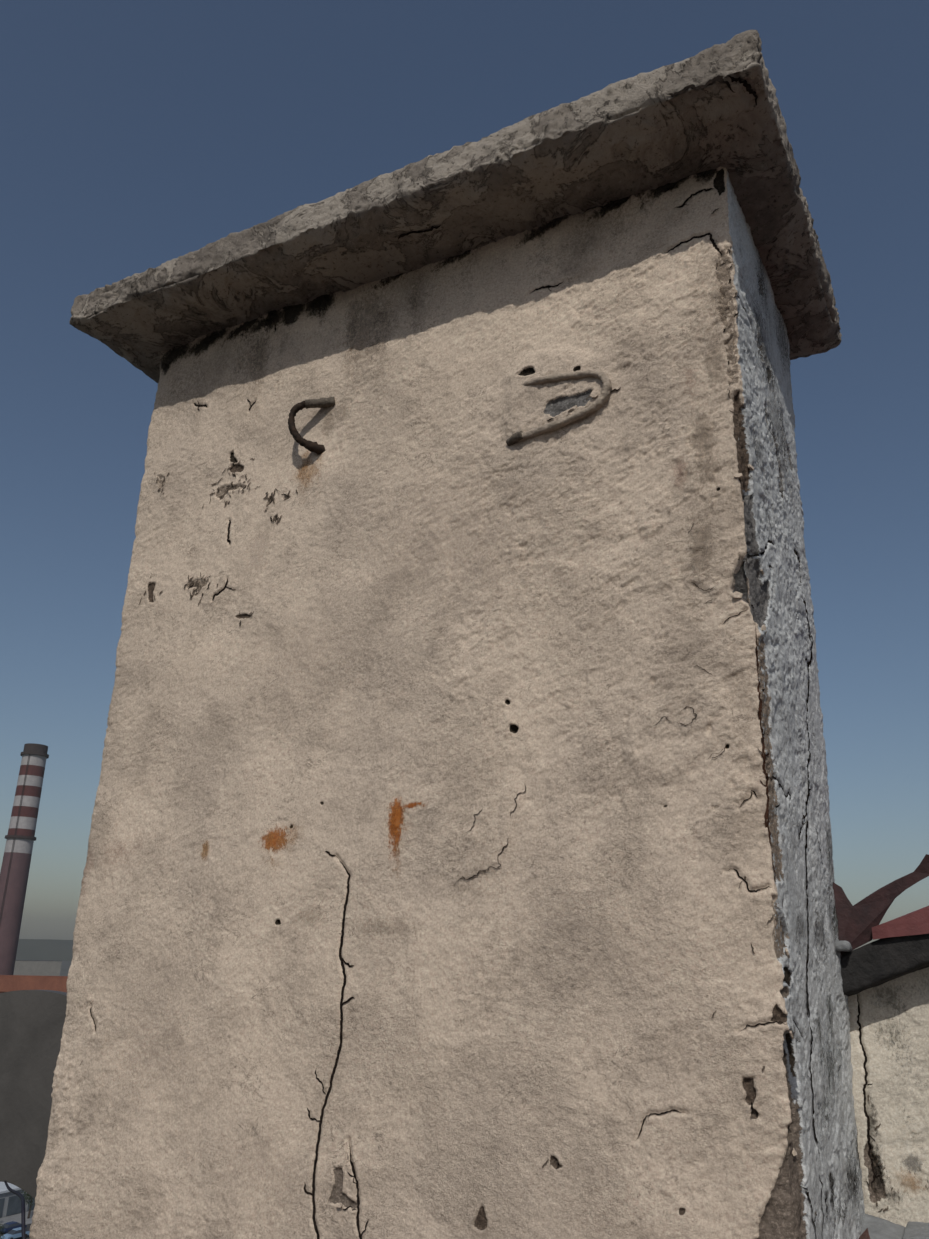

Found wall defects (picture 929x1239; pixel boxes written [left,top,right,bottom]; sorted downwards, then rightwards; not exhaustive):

crack [664,233,722,256]
water stain [159,293,335,374]
spalling [544,387,621,421]
spalling [715,245,794,881]
rust [261,827,287,852]
rust [389,798,424,853]
crack [723,539,824,1239]
crack [304,851,369,1239]
spalling [742,1066,765,1119]
spalling [758,899,817,1239]
crack [857,995,876,1196]
spalling [329,1168,357,1209]